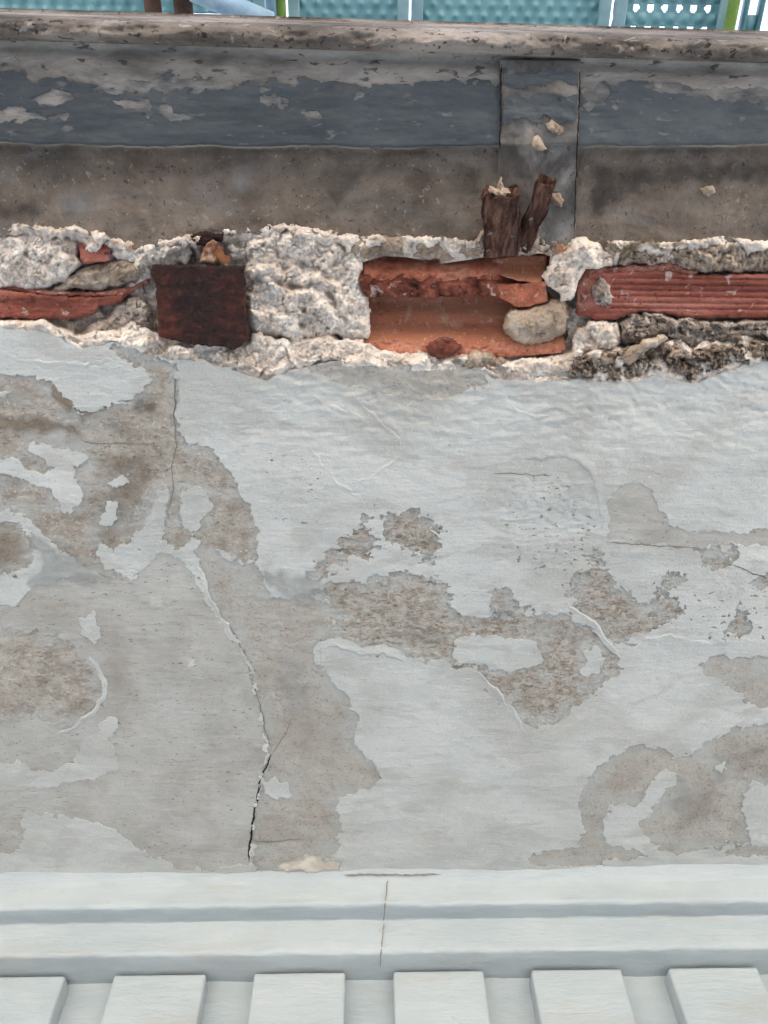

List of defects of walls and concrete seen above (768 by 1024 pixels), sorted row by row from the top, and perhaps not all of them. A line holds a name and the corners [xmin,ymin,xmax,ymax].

peeling [0,75,289,124]
peeling [300,107,323,120]
peeling [640,80,768,106]
peeling [0,222,768,872]
crack [230,627,301,860]
crack [347,873,438,966]